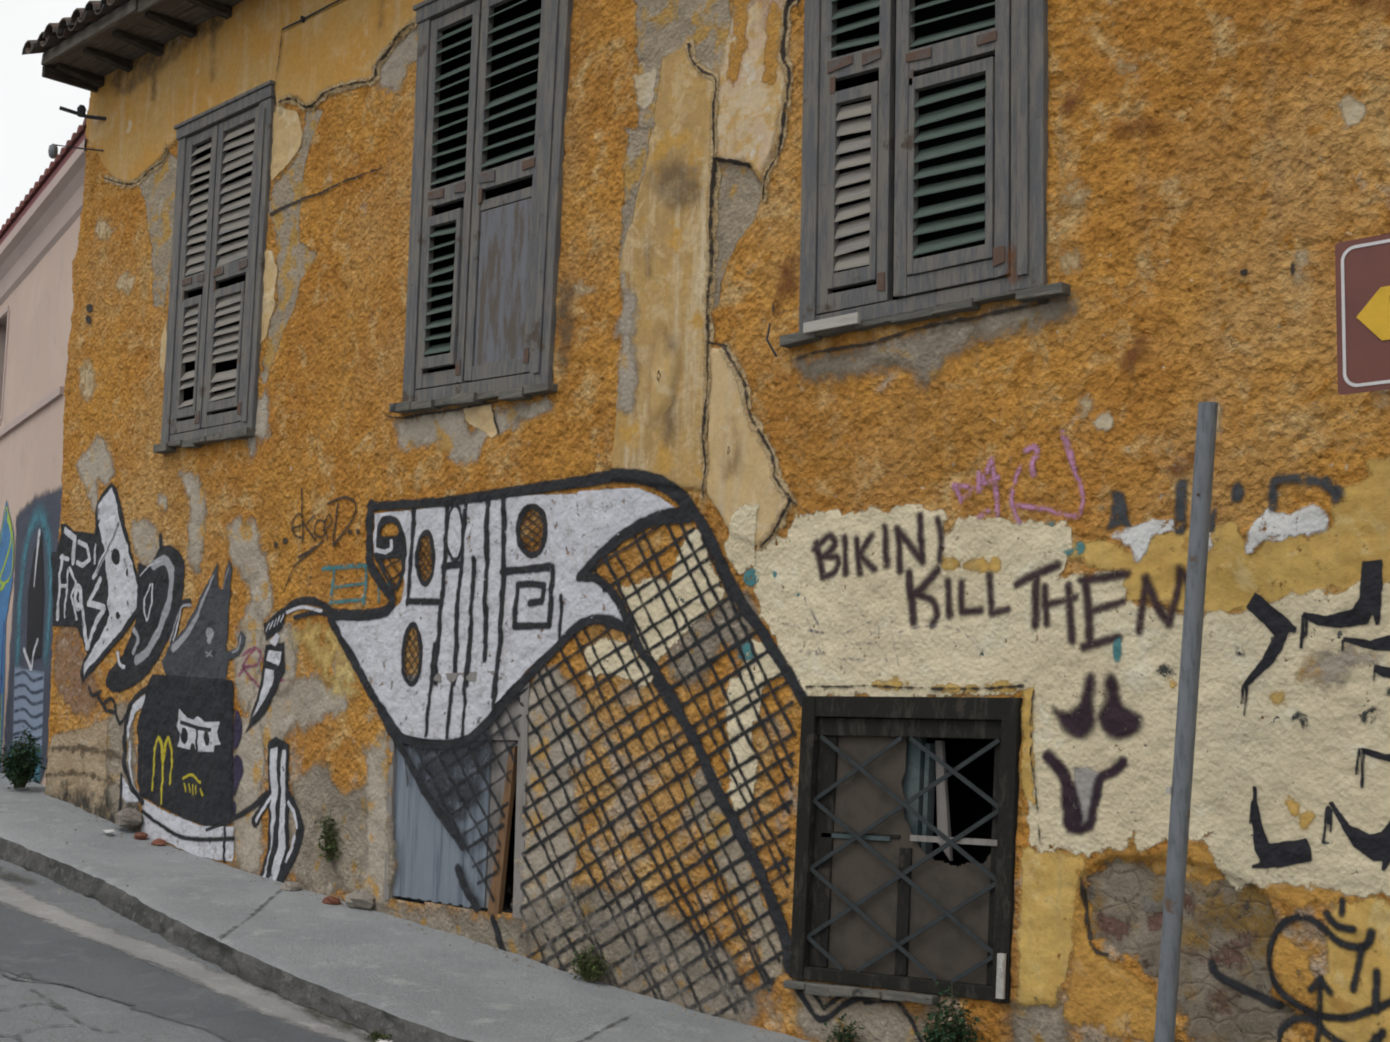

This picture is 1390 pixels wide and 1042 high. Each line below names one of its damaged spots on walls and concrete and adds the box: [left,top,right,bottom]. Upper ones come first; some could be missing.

crack [274,17,417,112]
spalling [372,25,418,93]
crack [104,144,169,189]
crack [270,167,383,216]
spalling [615,0,731,412]
spalling [247,106,323,456]
crack [685,0,809,551]
spalling [795,296,1077,387]
spalling [394,398,552,464]
spalling [45,626,142,833]
spalling [1085,858,1165,977]
spalling [1177,864,1296,1042]